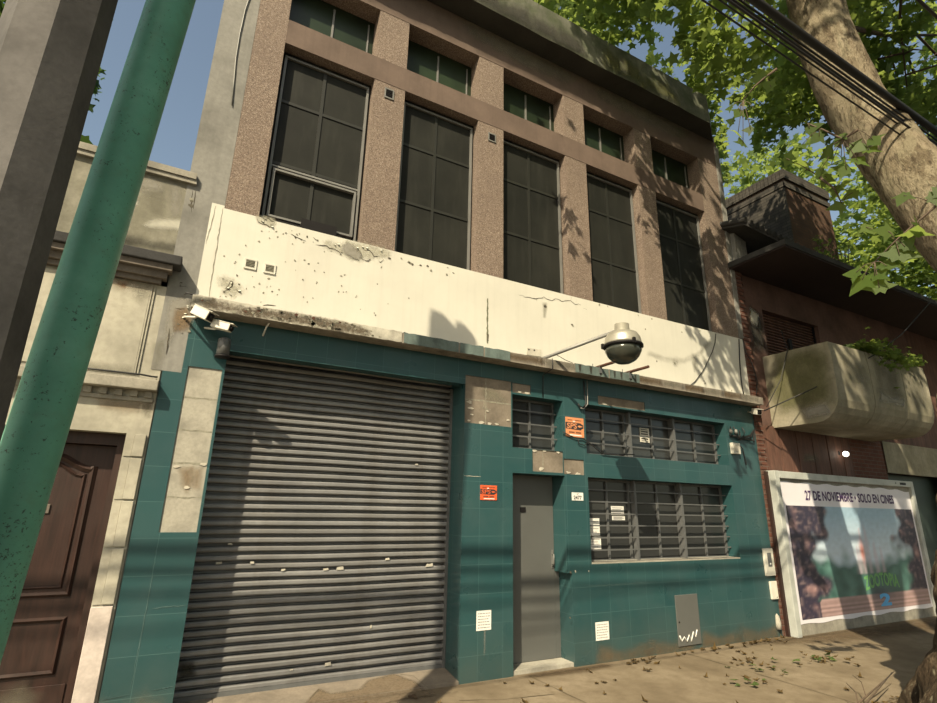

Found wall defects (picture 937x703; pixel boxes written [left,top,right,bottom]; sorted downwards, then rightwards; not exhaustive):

flaking render [257,218,432,271]
peeling [201,245,380,337]
water stain [775,353,829,417]